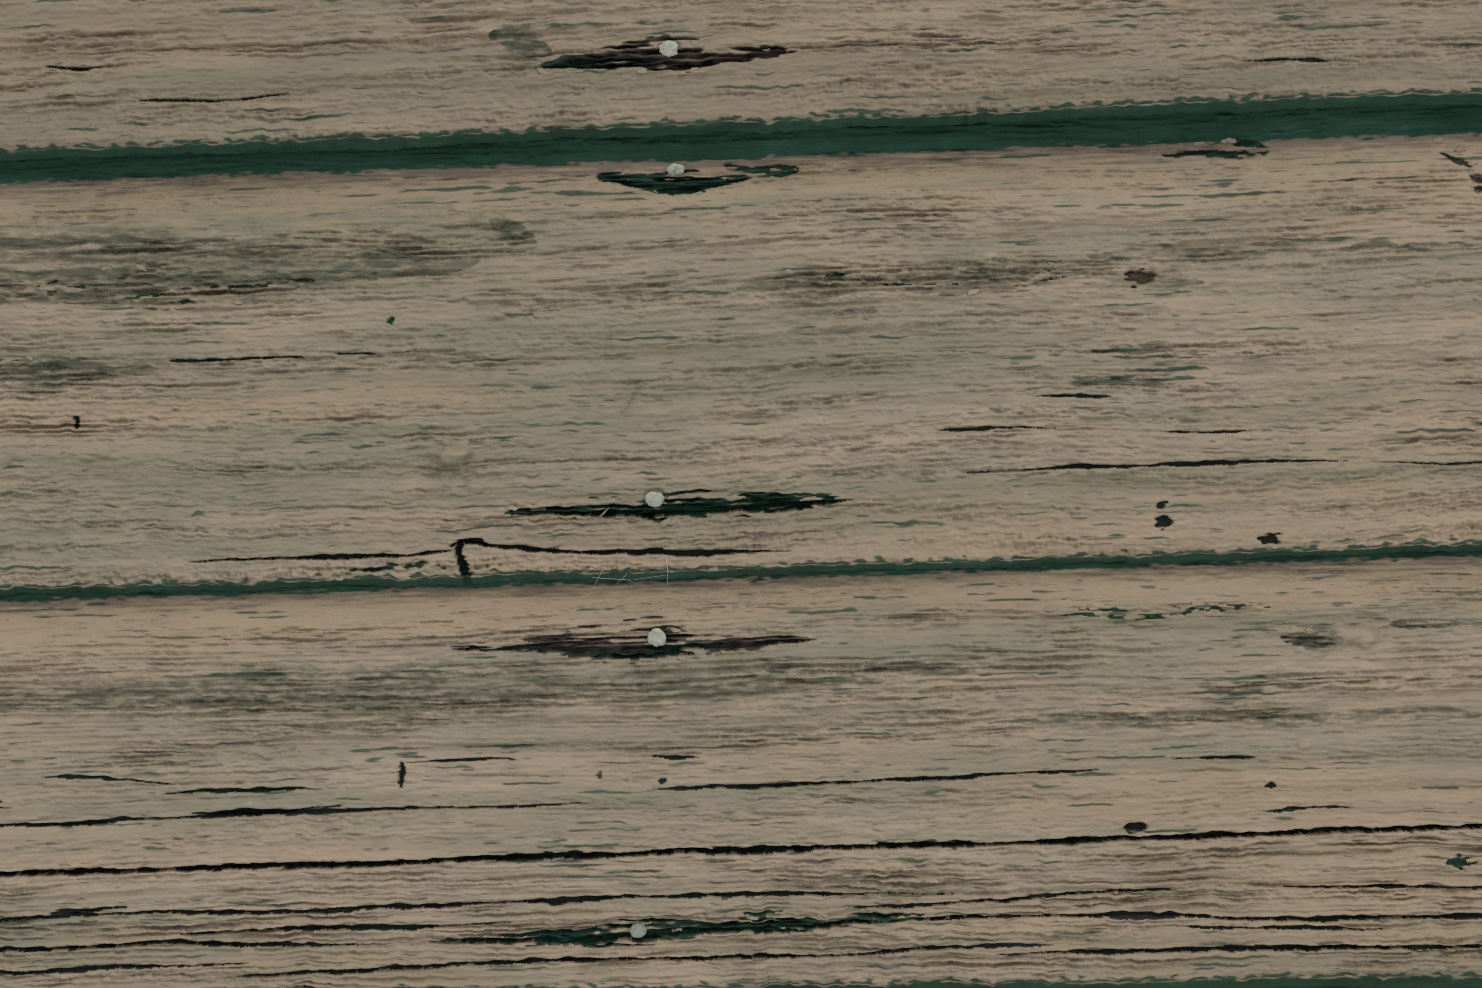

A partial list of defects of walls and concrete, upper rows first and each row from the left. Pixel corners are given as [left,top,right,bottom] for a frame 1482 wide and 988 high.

crack [199,538,769,576]
crack [0,757,581,827]
crack [653,755,1098,791]
crack [1176,753,1255,761]
crack [1267,805,1349,813]
crack [0,884,1482,978]